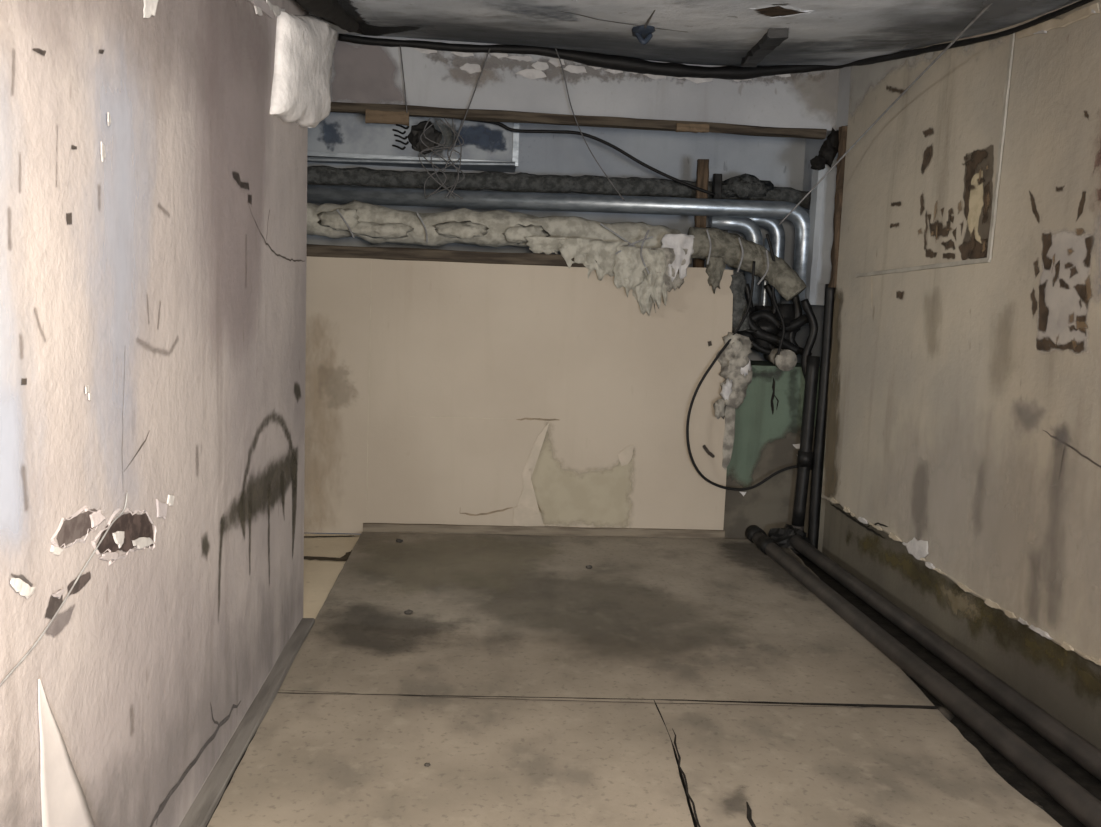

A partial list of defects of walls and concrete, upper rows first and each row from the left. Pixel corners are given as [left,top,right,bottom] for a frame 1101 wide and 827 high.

peeling [414,48,712,84]
spalling [50,495,175,566]
peeling [10,575,36,598]
spalling [45,572,91,637]
water stain [847,534,1101,697]